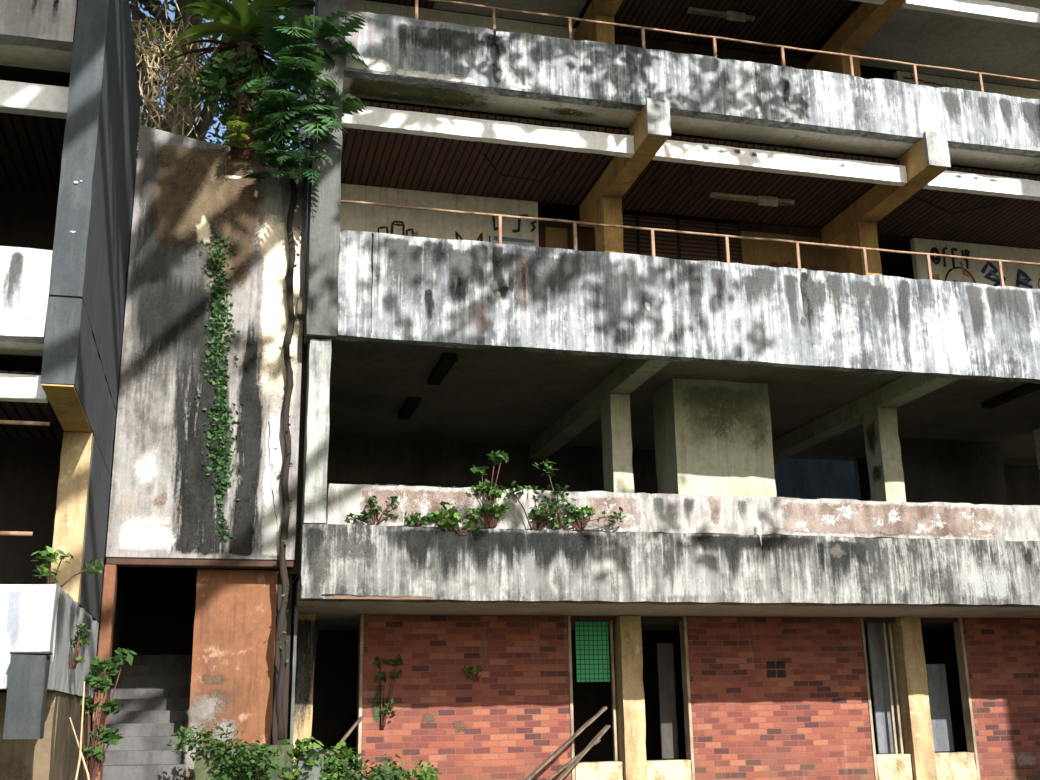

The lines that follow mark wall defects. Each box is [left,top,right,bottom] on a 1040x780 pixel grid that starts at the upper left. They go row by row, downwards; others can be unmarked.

water stain [399,24,513,56]
water stain [349,79,489,107]
water stain [543,108,591,117]
water stain [348,238,580,319]
water stain [689,262,725,316]
water stain [742,268,911,327]
water stain [661,301,673,342]
water stain [131,152,263,556]
water stain [654,497,664,516]
water stain [394,530,604,575]
water stain [666,498,866,596]